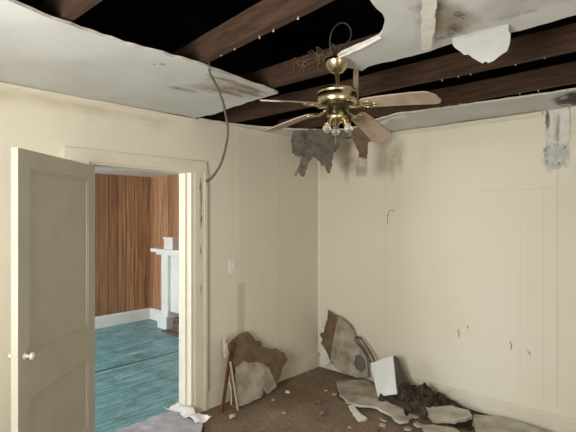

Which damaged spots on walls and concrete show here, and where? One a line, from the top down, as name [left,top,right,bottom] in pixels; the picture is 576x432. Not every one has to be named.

peeling [543,93,576,169]